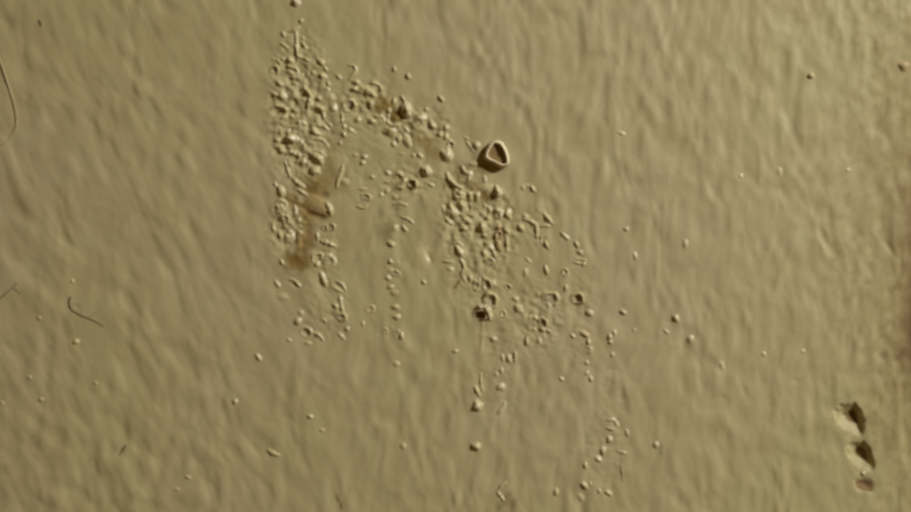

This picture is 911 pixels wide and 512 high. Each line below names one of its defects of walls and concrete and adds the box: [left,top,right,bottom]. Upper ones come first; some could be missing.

peeling [829,402,876,495]